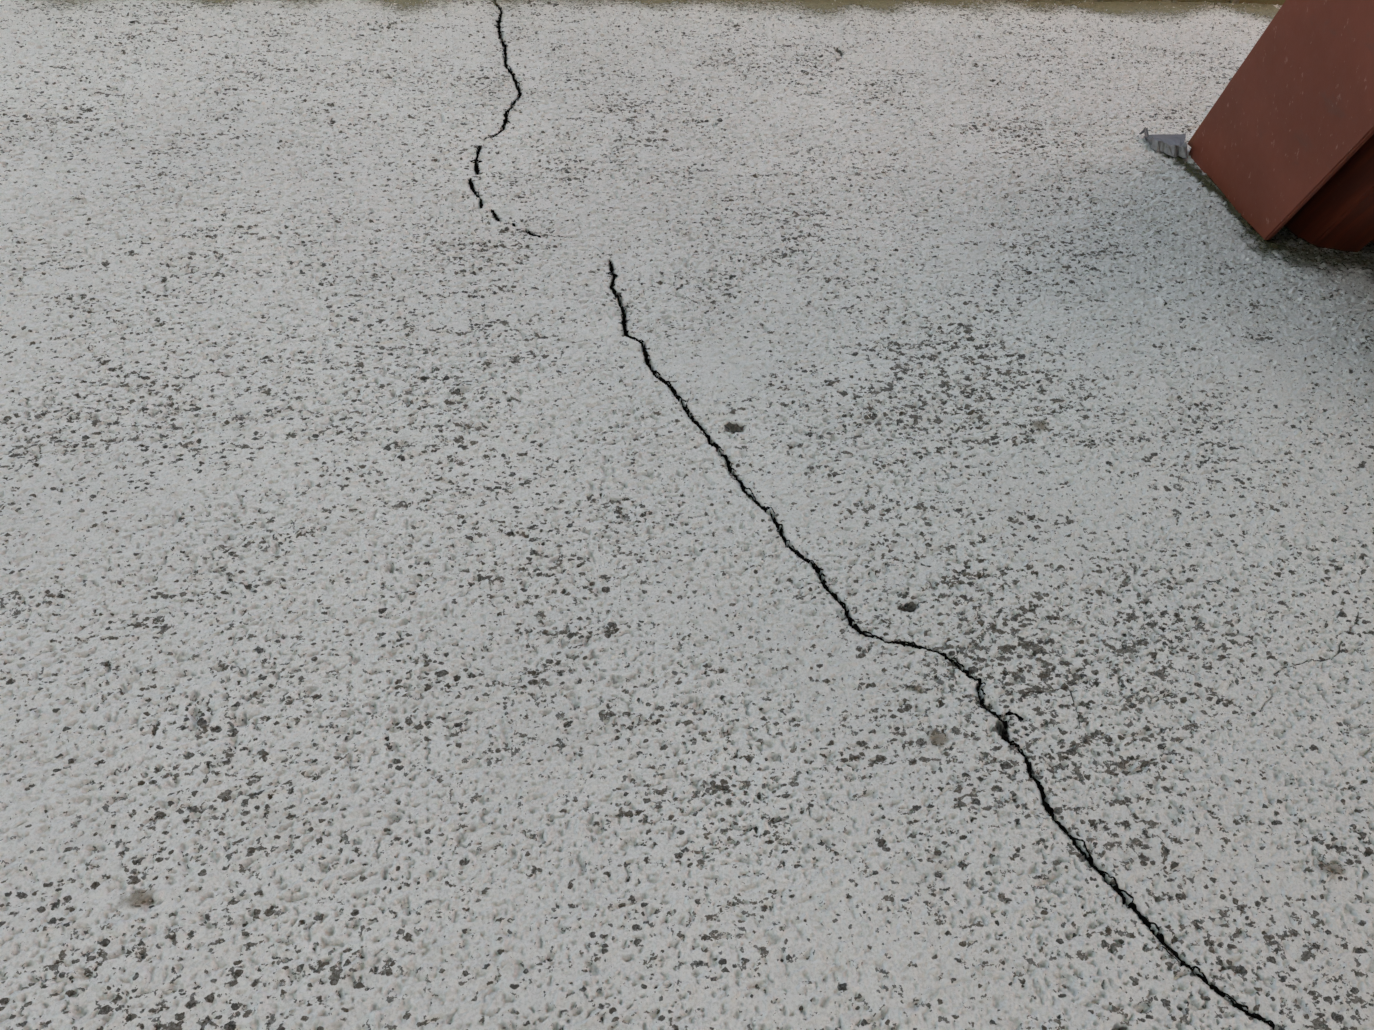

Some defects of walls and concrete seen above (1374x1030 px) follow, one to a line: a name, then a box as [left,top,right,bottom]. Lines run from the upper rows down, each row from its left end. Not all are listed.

crack [468,0,1275,1030]